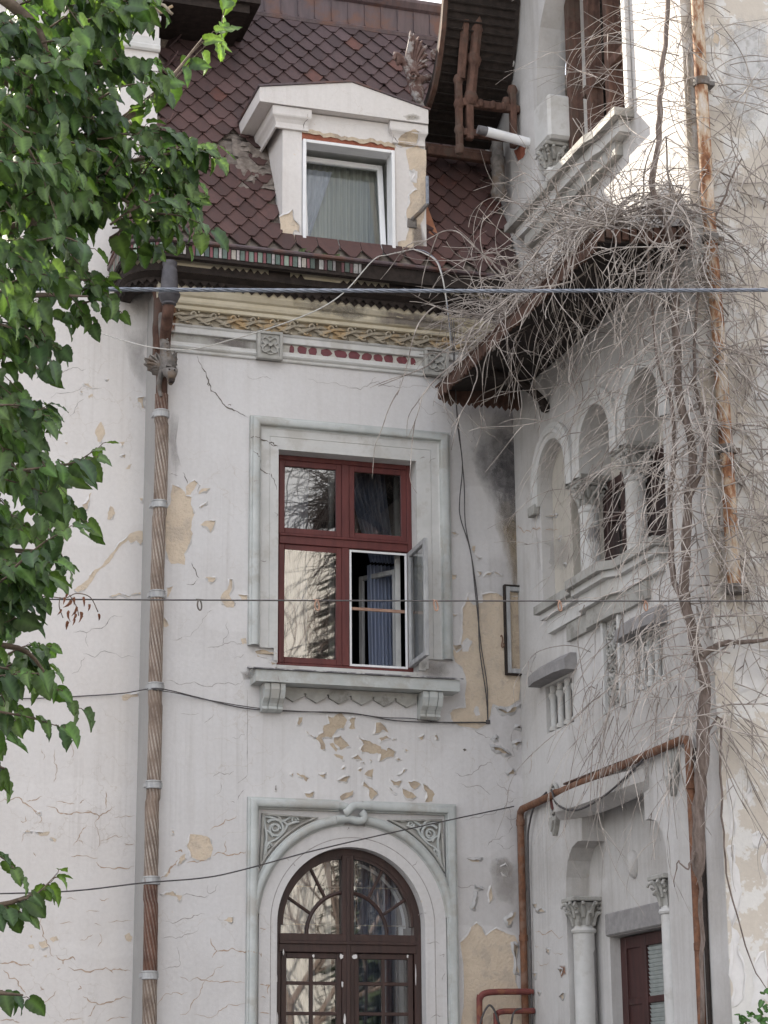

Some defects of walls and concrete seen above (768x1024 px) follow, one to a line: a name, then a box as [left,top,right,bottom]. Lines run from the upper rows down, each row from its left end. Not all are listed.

peeling [302,129,426,254]
peeling [73,531,143,593]
peeling [165,479,216,565]
crack [197,356,277,487]
water stain [483,431,515,503]
crack [0,744,133,869]
crack [161,610,248,878]
peeling [289,713,435,802]
peeling [448,590,522,776]
crack [1,897,131,1022]
crack [159,886,270,1018]
peeling [459,884,522,1024]